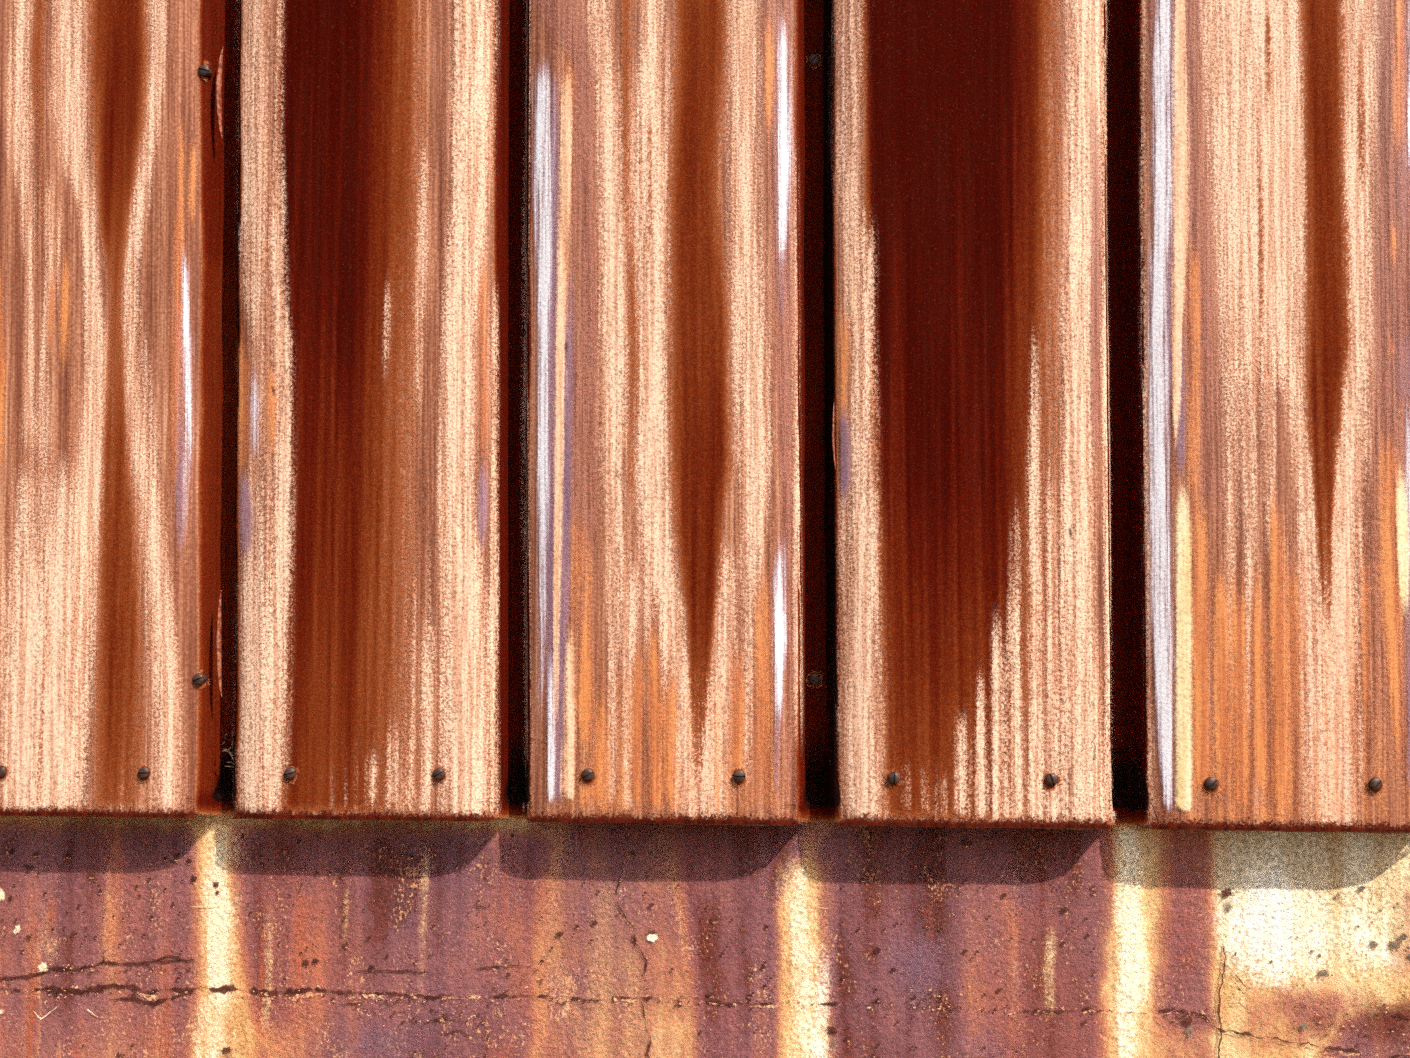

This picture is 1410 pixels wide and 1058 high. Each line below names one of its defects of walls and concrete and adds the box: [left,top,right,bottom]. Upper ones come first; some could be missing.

rust [1188,253,1201,499]
rust [1240,0,1273,355]
rust [1297,0,1366,625]
rust [1394,0,1404,141]
rust [0,0,799,1058]
rust [664,0,1151,1058]
rust [1192,510,1267,813]
rust [1270,502,1301,819]
rust [1347,444,1402,745]
crack [0,835,1410,1058]
rust [1148,815,1410,1058]